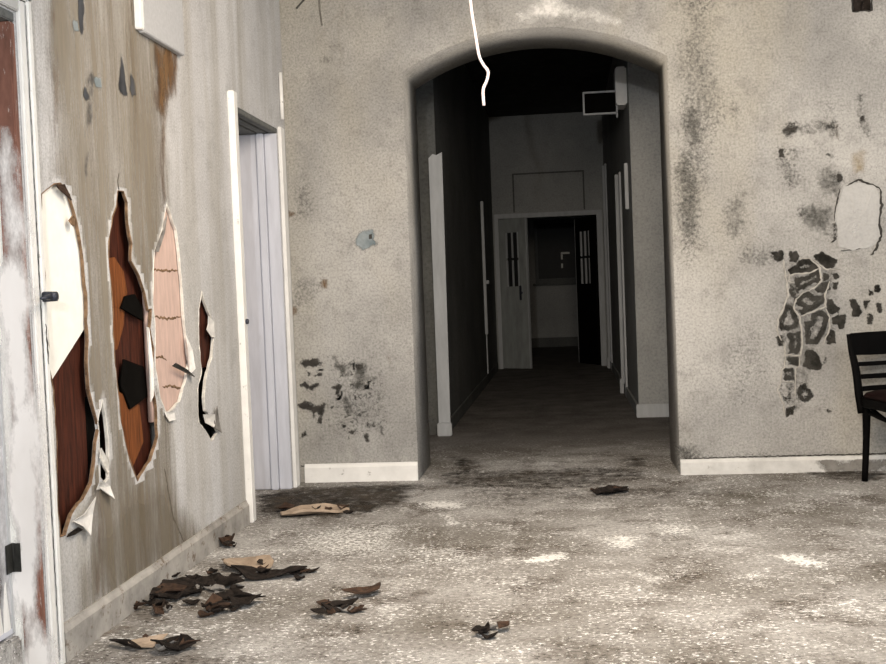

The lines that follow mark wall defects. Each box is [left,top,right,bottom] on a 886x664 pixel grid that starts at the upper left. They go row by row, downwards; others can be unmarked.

damp [681,36,712,244]
flaking render [41,182,115,537]
flaking render [108,174,222,481]
damp [300,358,322,390]
damp [298,364,382,442]
peeling [771,179,884,417]